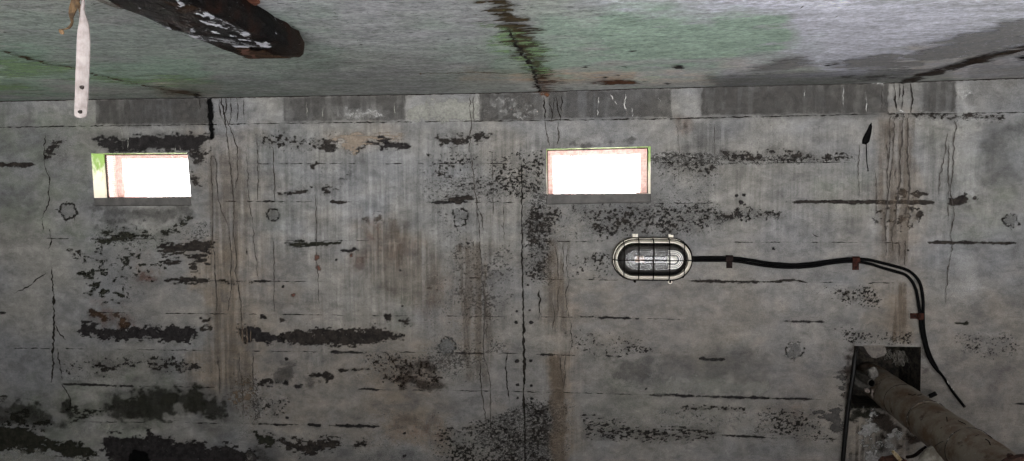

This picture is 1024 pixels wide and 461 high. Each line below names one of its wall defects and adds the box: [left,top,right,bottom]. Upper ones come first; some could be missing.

crack [0,96,75,104]
crack [320,28,1023,461]
crack [16,136,78,404]
water stain [0,399,81,436]
water stain [102,383,228,430]